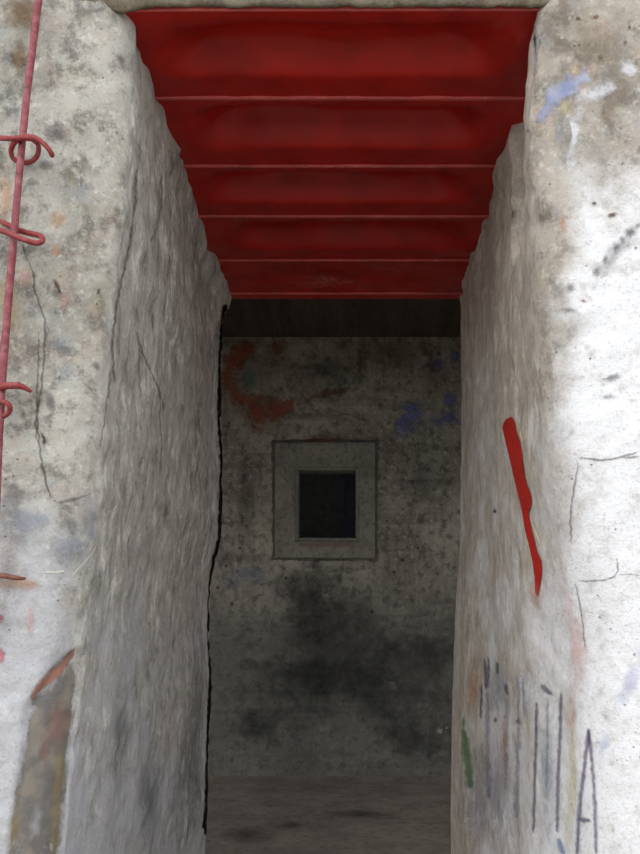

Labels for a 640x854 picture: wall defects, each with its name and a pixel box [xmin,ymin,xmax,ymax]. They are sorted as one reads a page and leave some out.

corrosion [14,1,34,26]
crack [33,274,51,496]
crack [202,305,228,834]